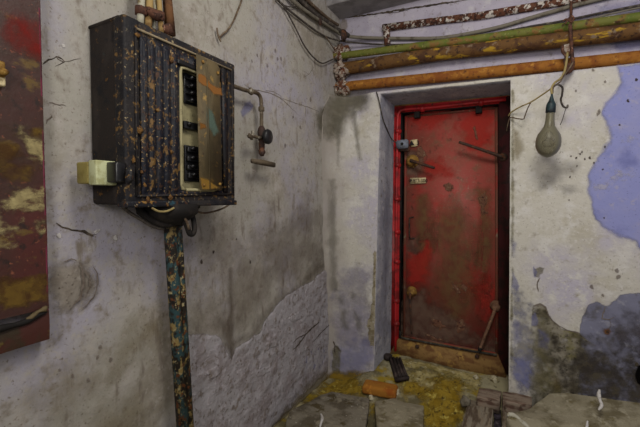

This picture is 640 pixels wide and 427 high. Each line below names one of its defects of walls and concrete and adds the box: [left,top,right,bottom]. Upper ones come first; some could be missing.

water stain [318,94,367,135]
peeling [570,64,640,248]
crack [56,223,101,237]
peeling [189,270,341,427]
crack [292,322,329,351]
peeling [512,291,640,406]
water stain [552,340,640,403]